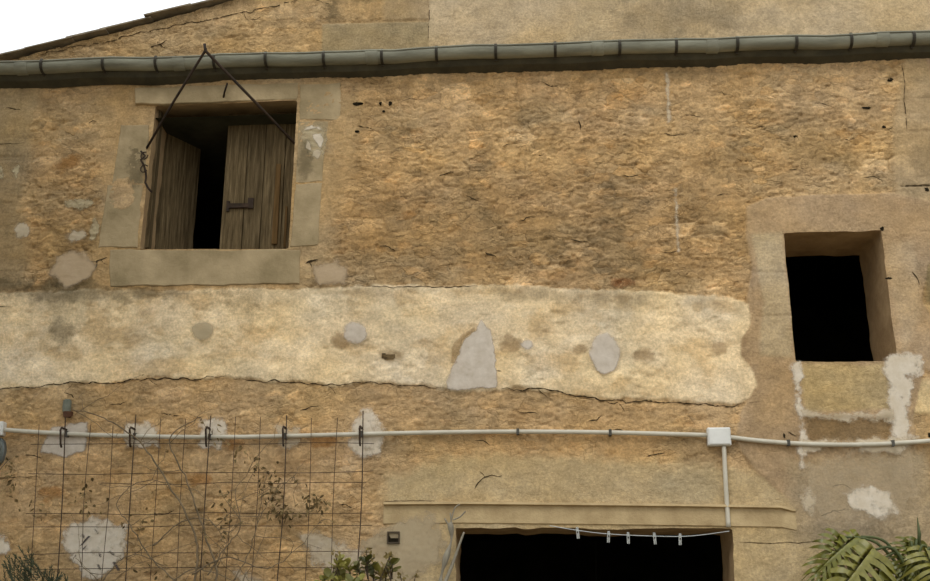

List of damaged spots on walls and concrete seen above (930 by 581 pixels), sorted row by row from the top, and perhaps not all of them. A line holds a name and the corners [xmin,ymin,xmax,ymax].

crack [31,0,329,56]
spalling [300,124,327,158]
crack [1,376,444,411]